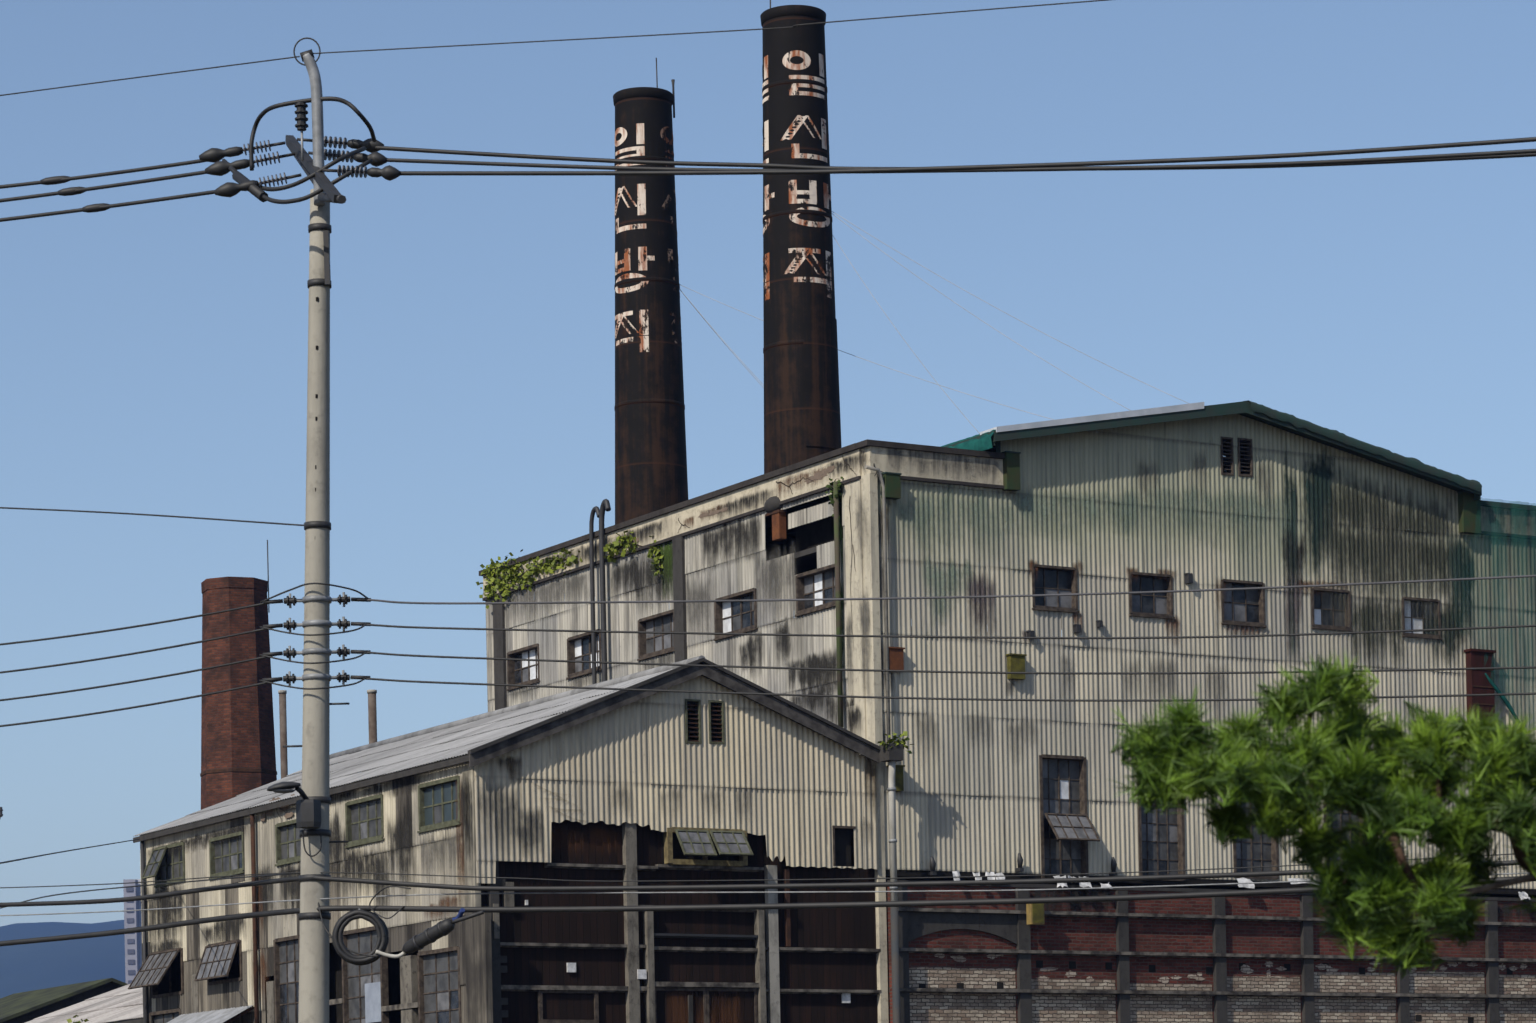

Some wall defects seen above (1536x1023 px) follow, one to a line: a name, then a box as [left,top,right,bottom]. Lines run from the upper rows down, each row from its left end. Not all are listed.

water stain [830,452,864,497]
water stain [839,448,1474,658]
water stain [740,567,893,733]
peeling [909,954,1536,1023]